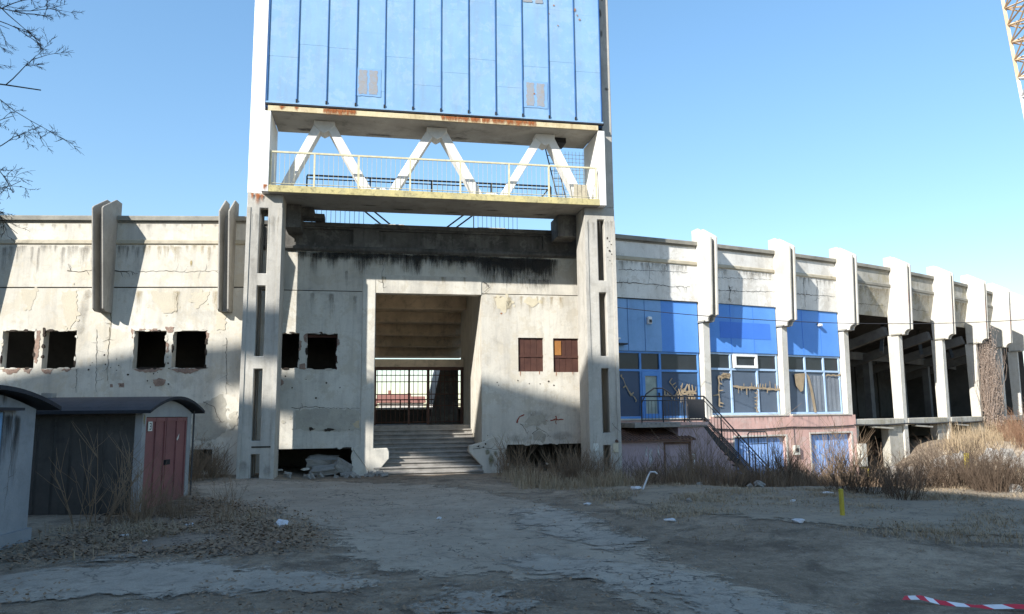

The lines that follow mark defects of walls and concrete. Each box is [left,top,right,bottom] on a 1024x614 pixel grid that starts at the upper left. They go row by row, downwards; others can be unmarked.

rust [441,116,536,126]
leakage [298,251,556,279]
crack [76,314,112,385]
flaking render [0,283,227,388]